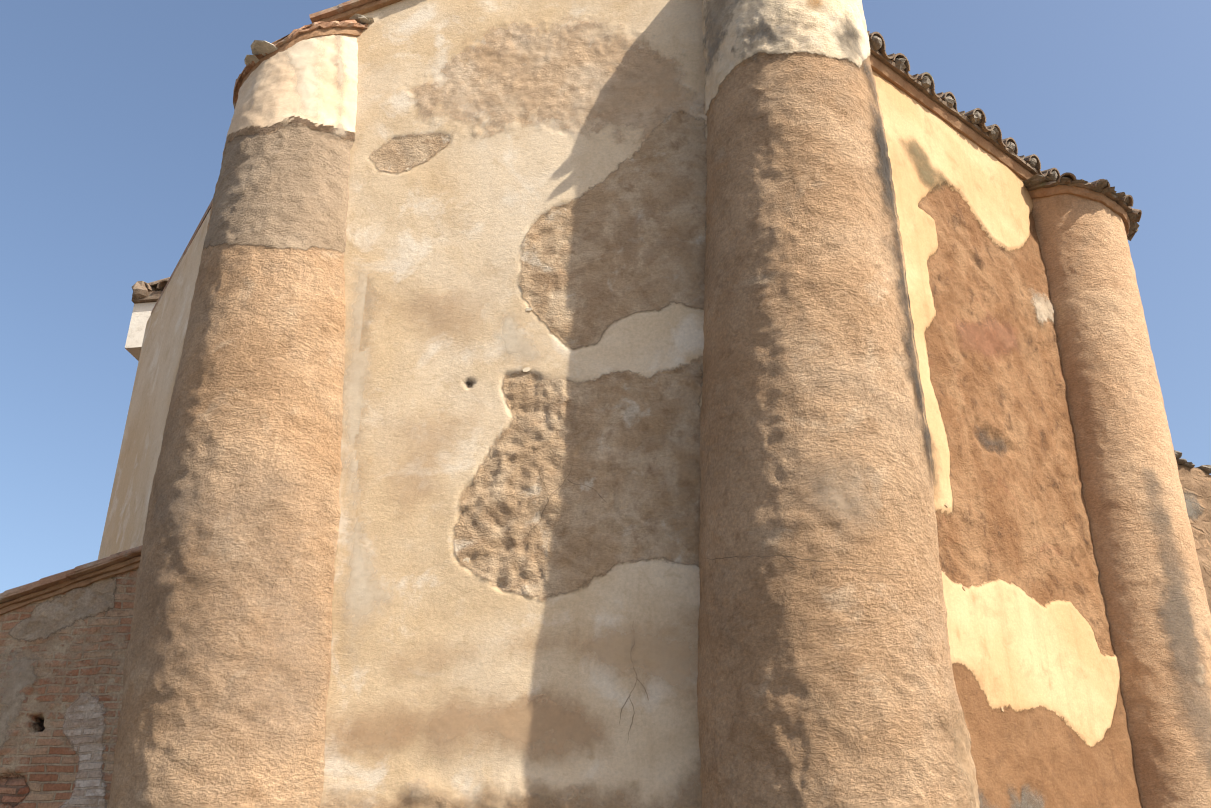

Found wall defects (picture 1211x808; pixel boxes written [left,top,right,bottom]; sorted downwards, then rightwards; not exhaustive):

flaking render [203,35,358,252]
flaking render [370,133,450,173]
flaking render [415,0,870,349]
water stain [863,63,936,485]
flaking render [453,356,703,601]
flaking render [918,182,1115,656]
flaking render [59,693,107,808]
water stain [429,694,600,755]
crack [619,621,649,743]
flaking render [952,663,1143,808]